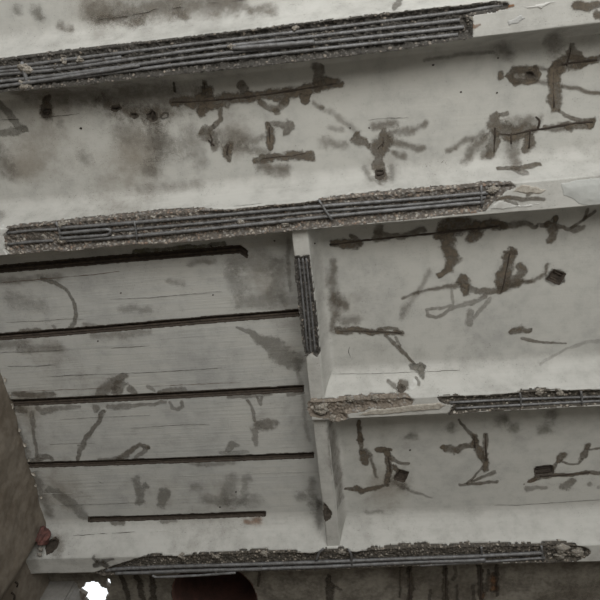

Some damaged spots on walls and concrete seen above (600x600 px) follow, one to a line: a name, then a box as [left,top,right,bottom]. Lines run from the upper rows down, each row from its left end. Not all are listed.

spalling [0,0,509,92]
water stain [0,101,27,135]
spalling [0,181,546,255]
spalling [294,255,321,357]
spalling [307,377,600,422]
spalling [95,539,591,578]